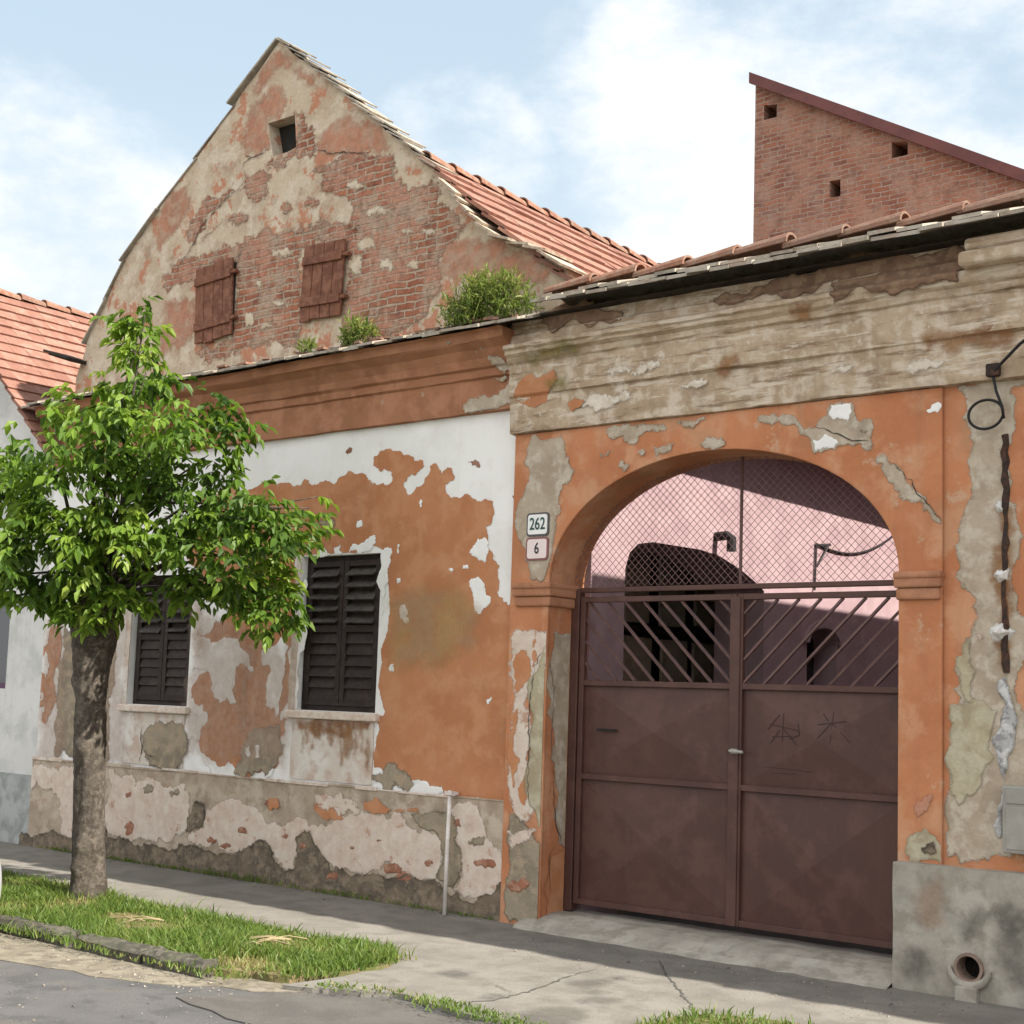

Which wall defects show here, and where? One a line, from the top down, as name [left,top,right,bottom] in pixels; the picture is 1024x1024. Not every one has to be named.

crack [178,149,268,266]
spalling [156,52,550,369]
spalling [709,245,966,306]
peeling [567,390,633,412]
spalling [600,416,705,471]
peeling [681,378,707,388]
spalling [700,436,725,450]
peeling [906,358,944,374]
peeling [513,434,574,582]
spalling [905,380,1024,864]
spalling [18,625,76,852]
peeling [105,449,570,922]